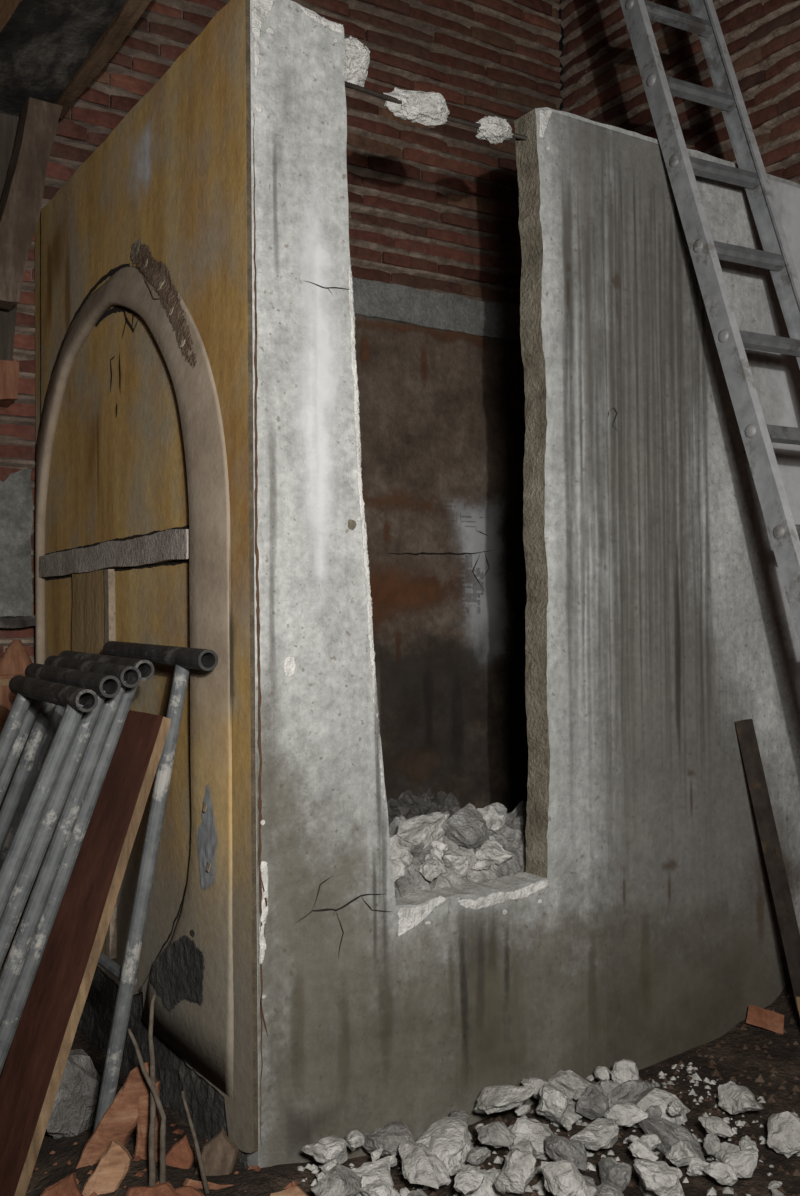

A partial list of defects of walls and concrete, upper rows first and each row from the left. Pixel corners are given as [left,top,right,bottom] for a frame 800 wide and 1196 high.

spalling [251,0,275,82]
spalling [300,6,344,42]
crack [303,280,350,295]
crack [253,113,268,1092]
leakage [256,124,790,1167]
crack [296,877,393,958]